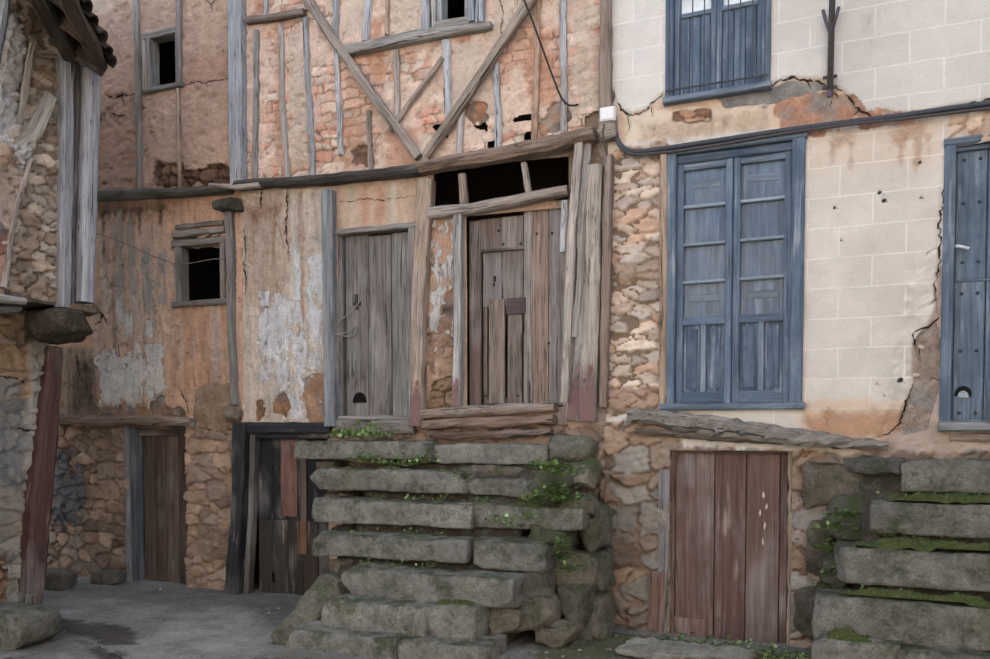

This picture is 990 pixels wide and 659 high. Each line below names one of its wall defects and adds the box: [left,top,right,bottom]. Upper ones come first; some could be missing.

spalling [152,161,230,188]
spalling [673,108,711,122]
spalling [719,81,916,137]
peeling [94,246,186,417]
peeling [252,244,324,422]
peeling [426,218,459,409]
crack [874,377,938,438]
crack [912,189,944,354]